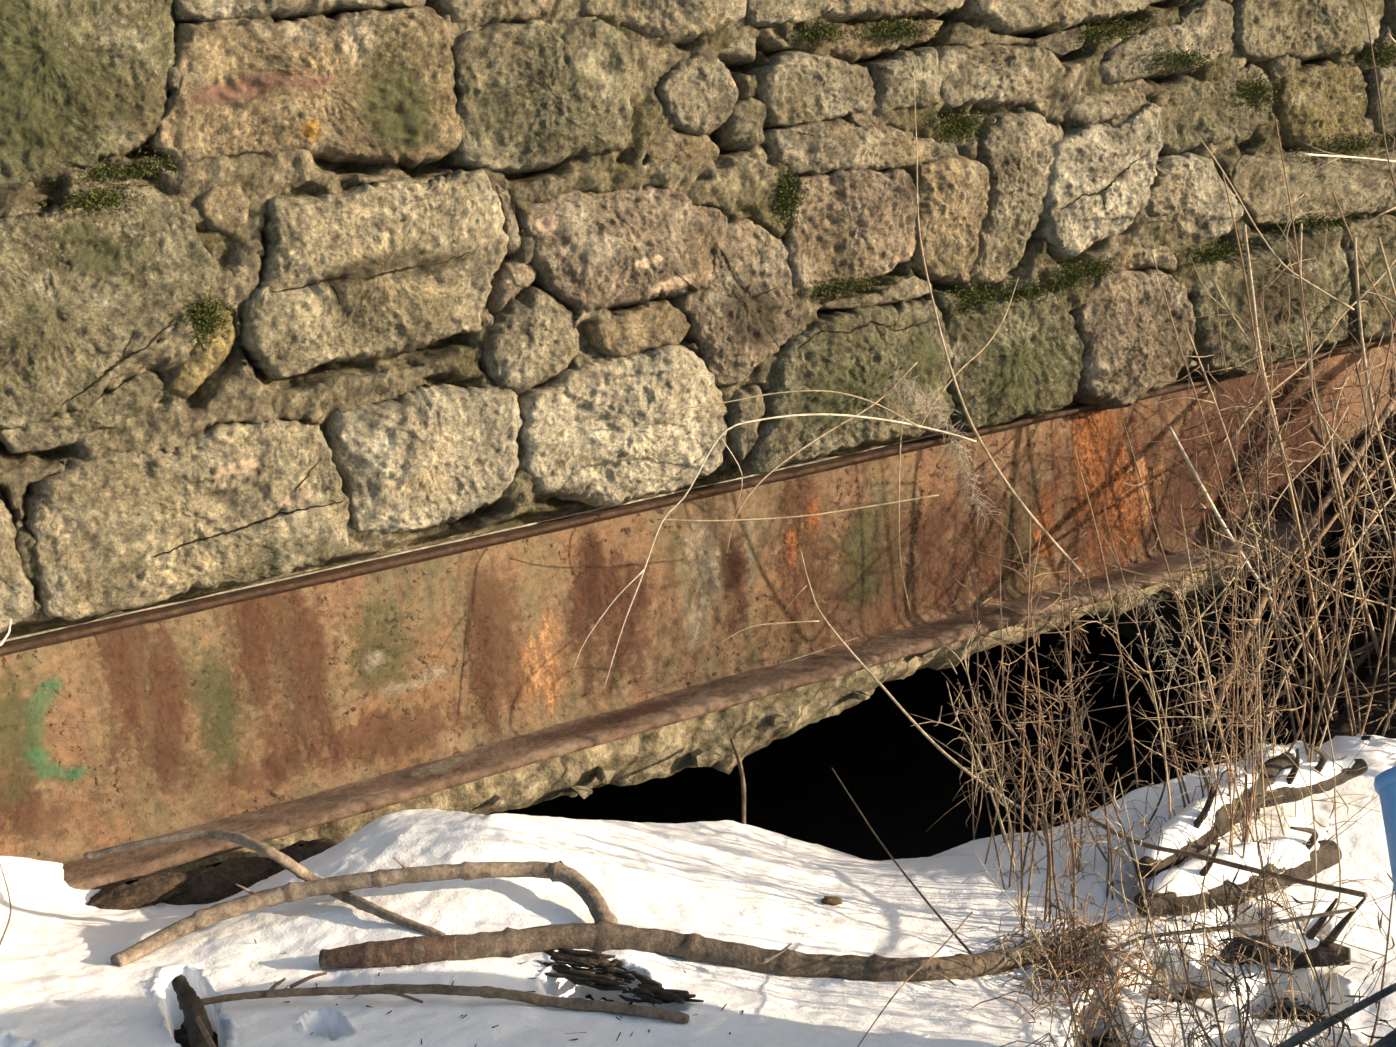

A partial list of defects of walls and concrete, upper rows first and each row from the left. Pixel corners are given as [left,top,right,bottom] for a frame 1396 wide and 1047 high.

crack [271,252,472,311]
crack [153,460,343,557]
rust [722,527,748,628]
rust [786,500,820,565]
rust [522,535,688,735]
spalling [149,534,1332,875]